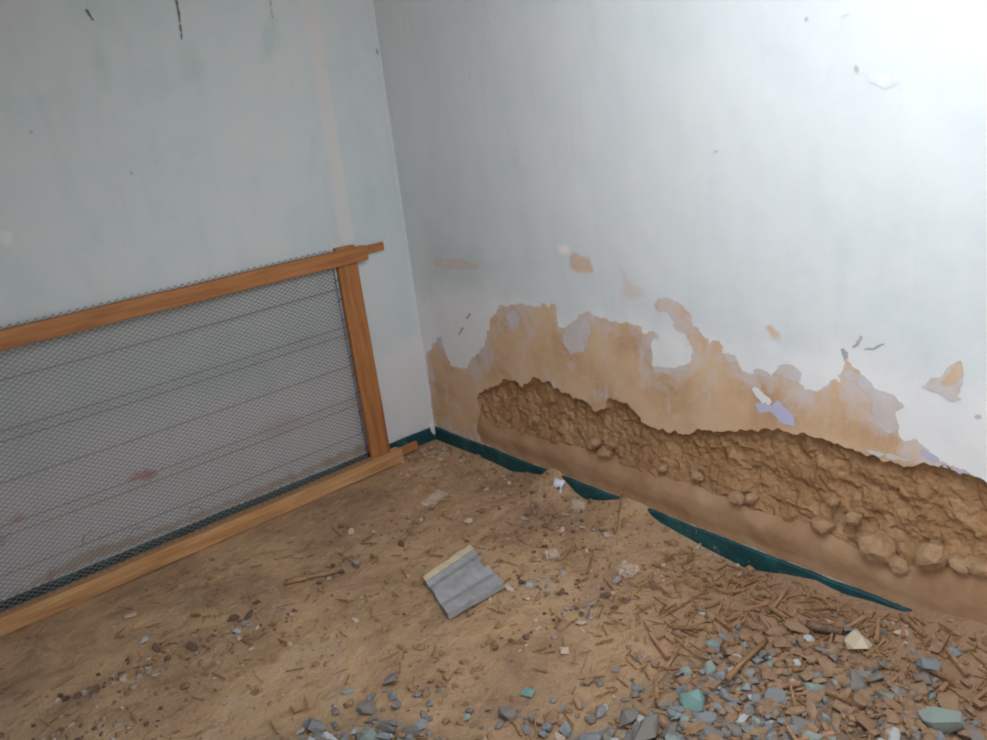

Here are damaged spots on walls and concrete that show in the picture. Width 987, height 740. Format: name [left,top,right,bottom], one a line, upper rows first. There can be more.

peeling [555,240,595,276]
peeling [388,287,987,483]
peeling [0,442,369,600]
peeling [737,542,907,608]